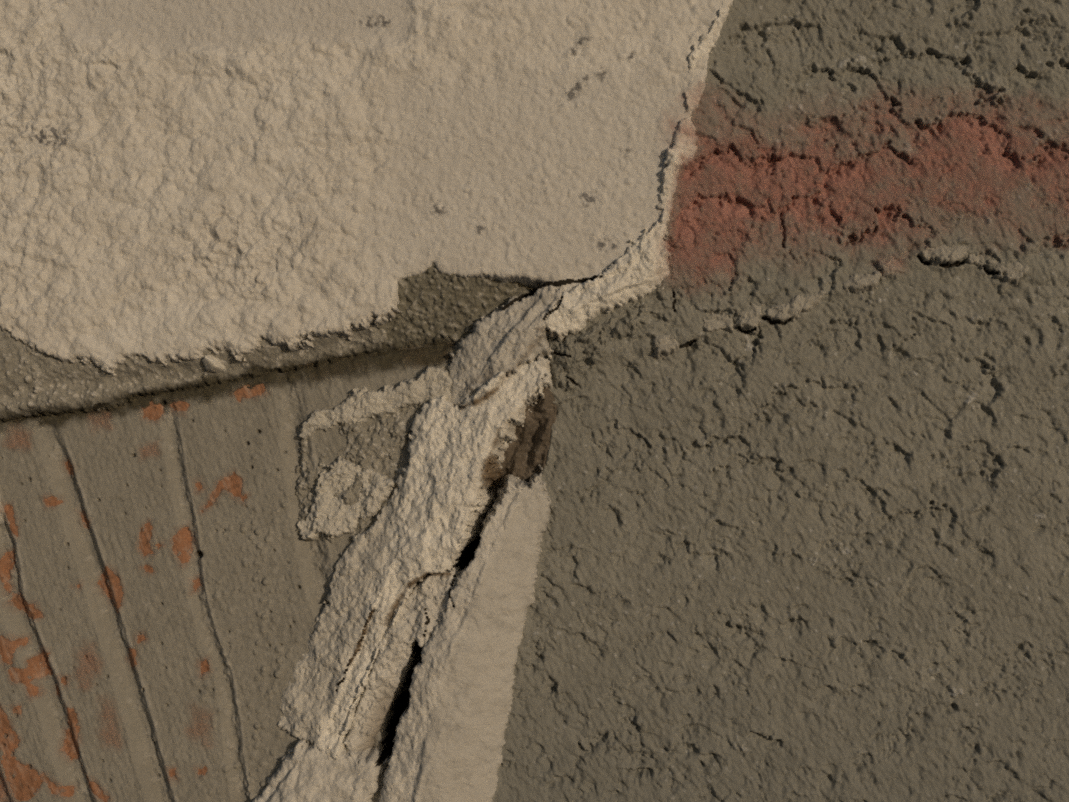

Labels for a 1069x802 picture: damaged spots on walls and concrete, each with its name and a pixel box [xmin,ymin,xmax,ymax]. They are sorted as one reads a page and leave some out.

crack [501,275,602,320]
crack [274,343,456,373]
crack [554,351,578,386]
crack [0,411,49,423]
crack [78,402,111,410]
flaking render [0,0,733,802]
crack [375,537,481,767]